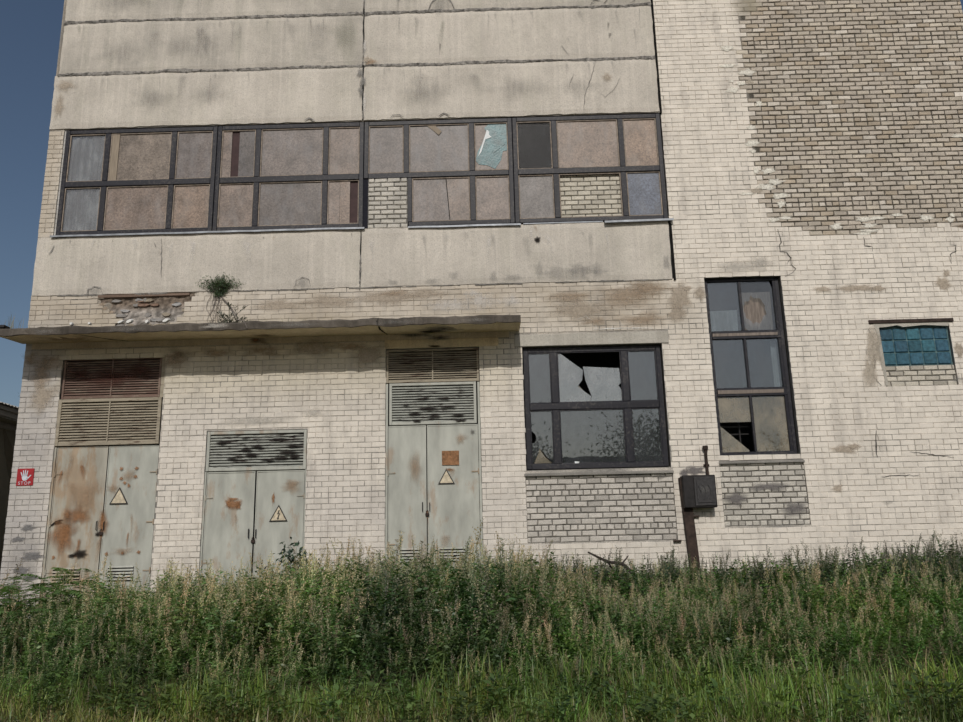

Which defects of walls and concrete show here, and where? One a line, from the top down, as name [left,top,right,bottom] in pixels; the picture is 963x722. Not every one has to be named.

peeling [720,0,963,236]
spalling [72,286,195,326]
water stain [407,327,450,347]
rust [226,498,240,509]
rust [51,491,89,559]